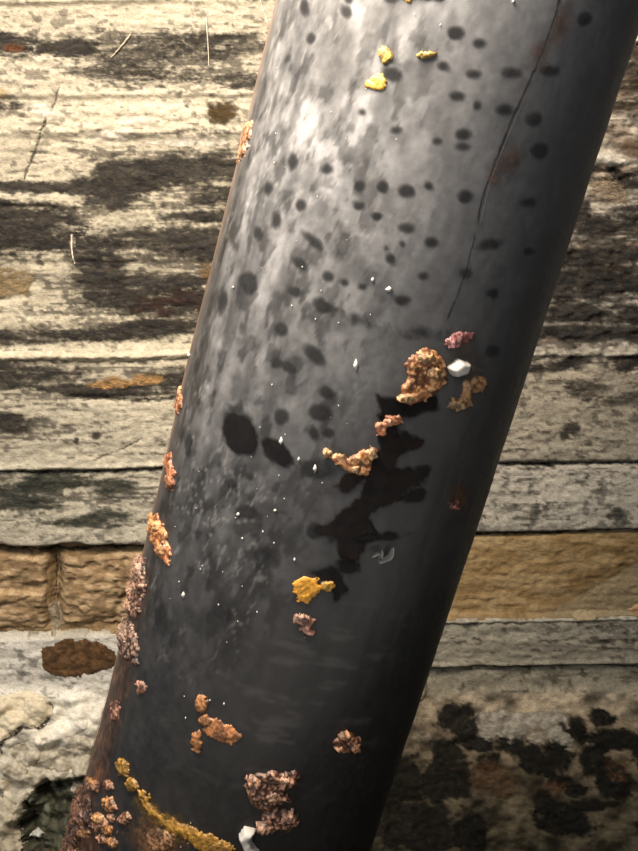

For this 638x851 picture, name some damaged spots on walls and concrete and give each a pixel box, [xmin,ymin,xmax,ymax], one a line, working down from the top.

crack [470,0,564,253]
leakage [0,138,237,345]
leakage [0,361,185,400]
leakage [376,394,438,422]
rust [396,331,487,412]
rust [323,445,378,476]
rust [292,576,335,638]
leakage [312,560,360,602]
spalling [0,713,95,851]
rust [60,758,236,851]
rust [242,770,301,836]
leakage [376,702,638,851]